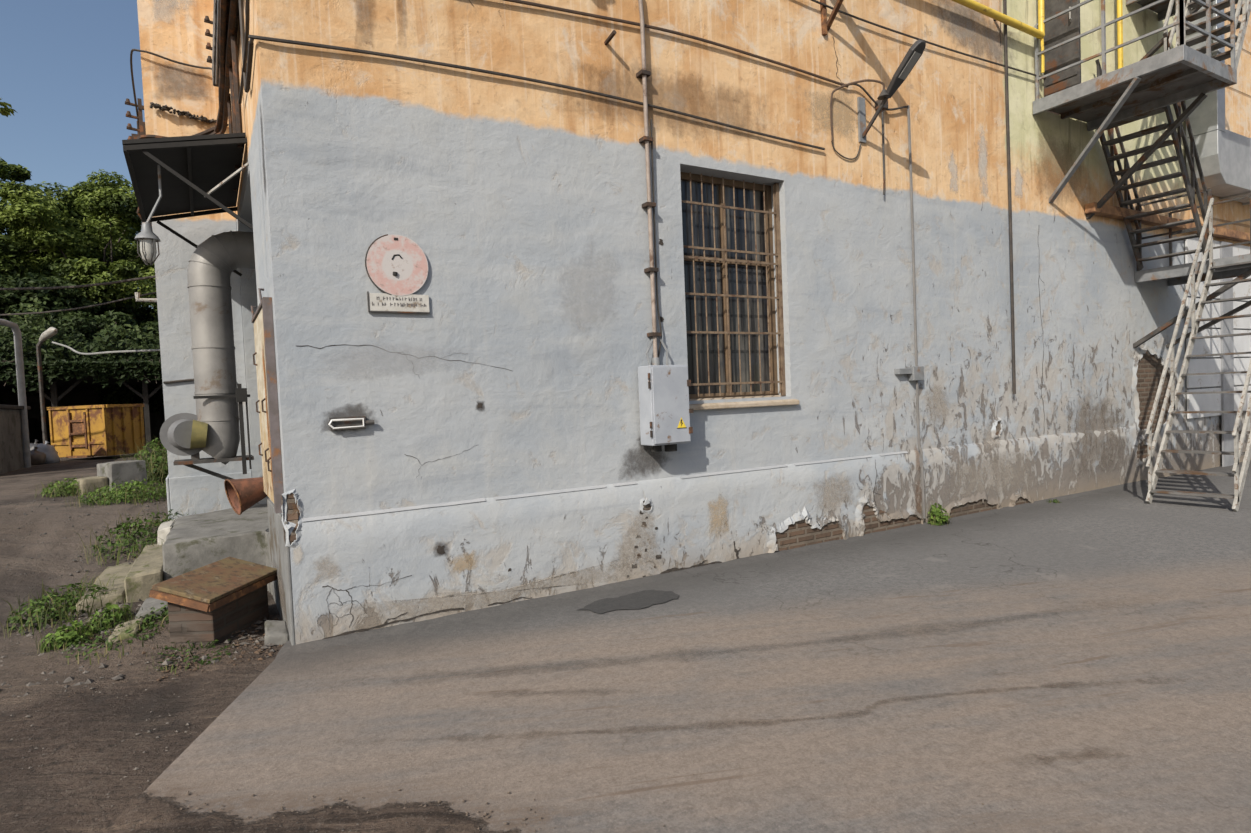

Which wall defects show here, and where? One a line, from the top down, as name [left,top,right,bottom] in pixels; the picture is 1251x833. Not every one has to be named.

crack [304,344,511,376]
rust [262,349,273,485]
spalling [986,417,1003,444]
flaking render [1131,344,1171,468]
spalling [281,489,304,562]
flaking render [766,495,924,553]
flaking render [944,491,1034,518]
crack [321,575,532,640]